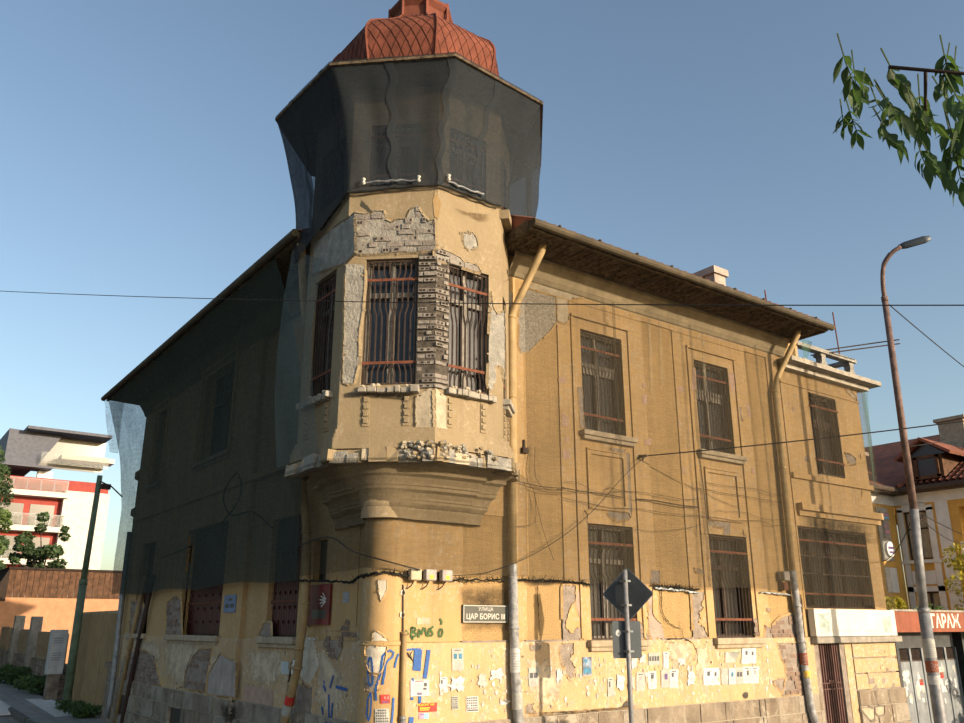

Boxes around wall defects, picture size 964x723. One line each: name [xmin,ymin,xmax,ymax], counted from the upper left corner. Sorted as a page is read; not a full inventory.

flaking render [311,191,482,429]
flaking render [485,282,584,391]
flaking render [119,595,389,717]
peeling [523,582,584,714]
flaking render [637,569,713,684]
crack [661,590,698,663]
flaking render [752,593,807,697]